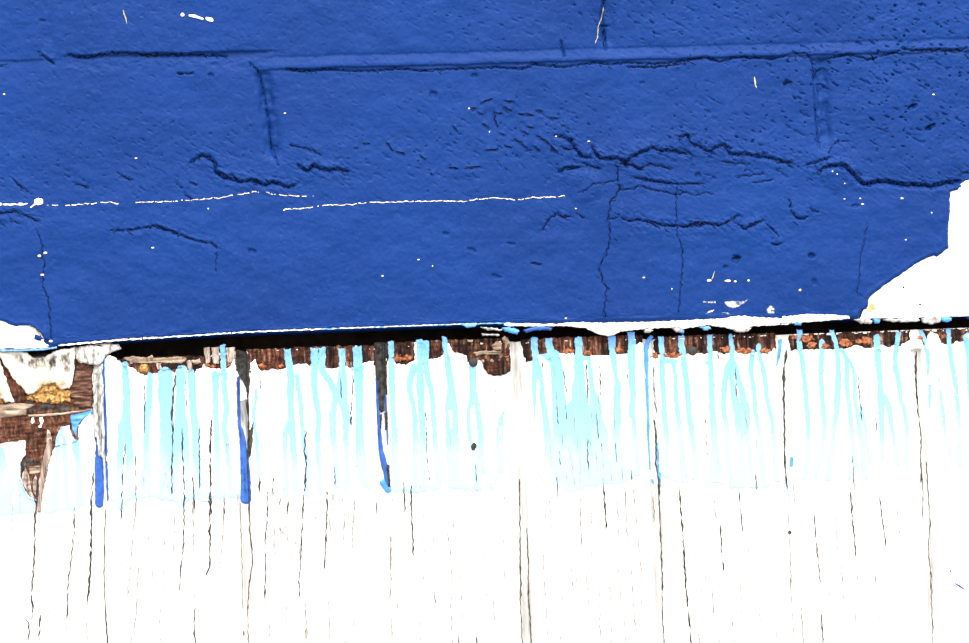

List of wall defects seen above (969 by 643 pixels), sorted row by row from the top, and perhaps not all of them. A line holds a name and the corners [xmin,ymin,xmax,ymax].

crack [0,0,969,343]
crack [12,467,41,640]
peeling [0,180,969,513]
crack [66,341,934,643]